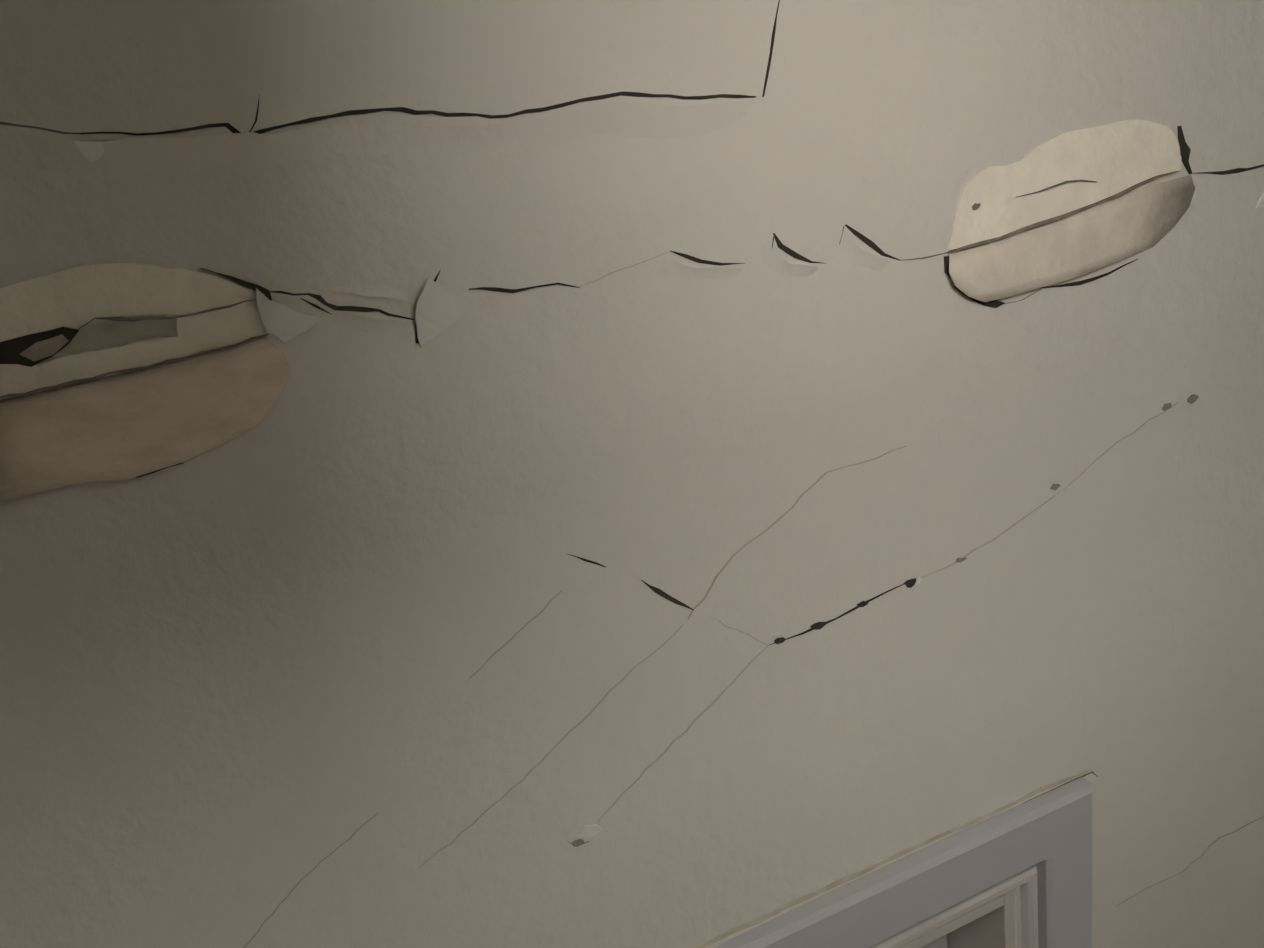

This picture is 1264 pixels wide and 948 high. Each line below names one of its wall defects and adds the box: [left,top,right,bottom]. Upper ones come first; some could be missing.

crack [256,224,949,347]
peeling [944,120,1195,308]
crack [1199,164,1264,209]
peeling [0,263,289,502]
crack [418,446,905,869]
crack [243,812,379,948]
crack [690,769,1098,948]